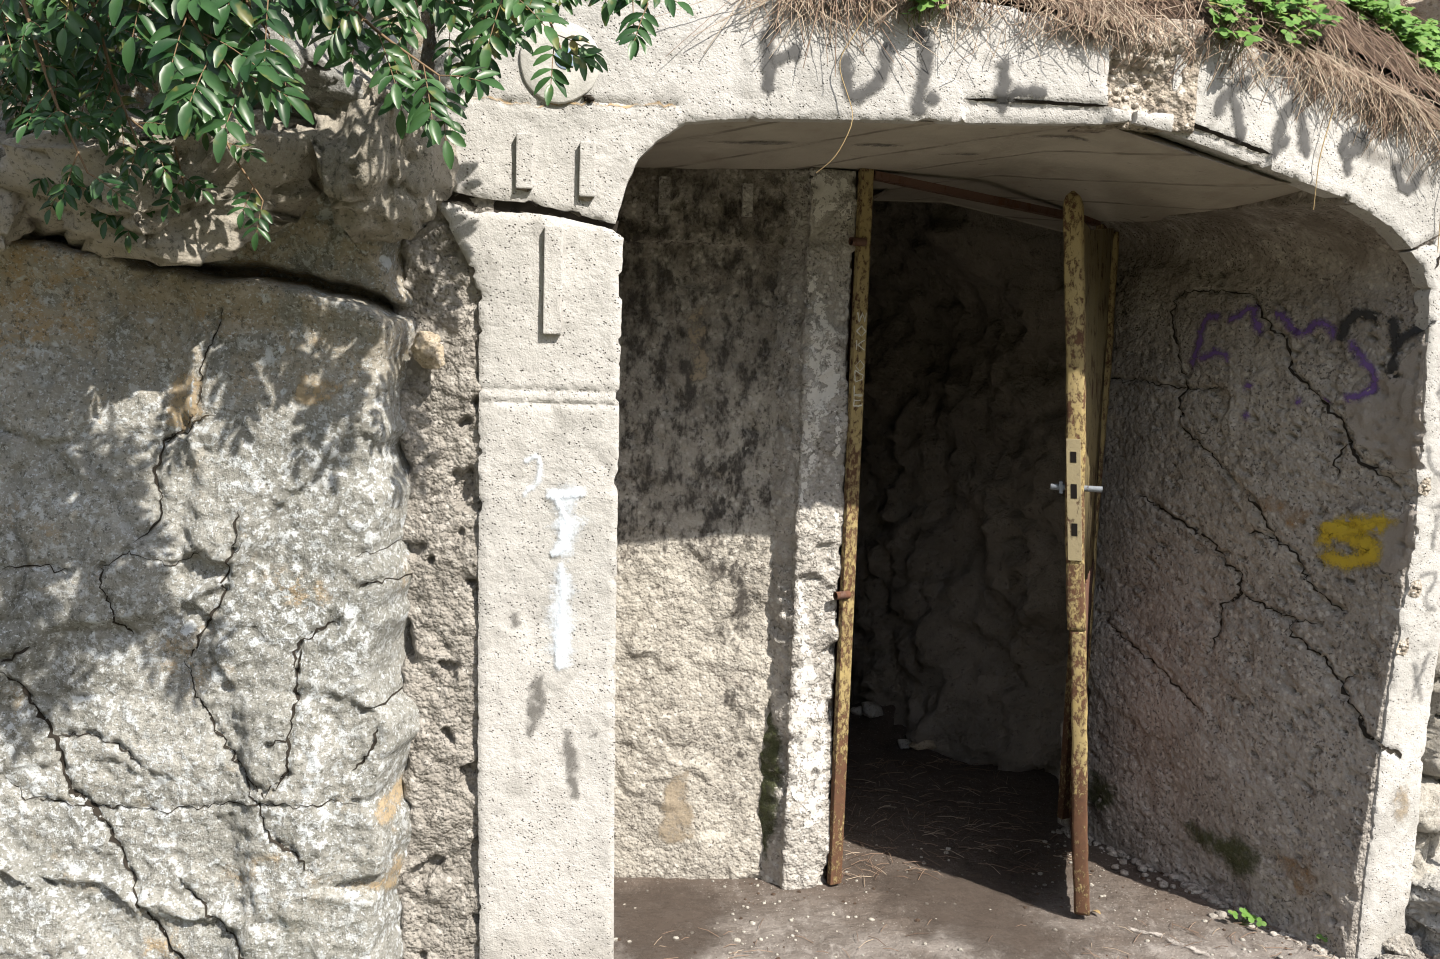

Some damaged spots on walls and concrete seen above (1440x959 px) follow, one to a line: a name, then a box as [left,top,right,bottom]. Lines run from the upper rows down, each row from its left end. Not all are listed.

leakage [608,169,785,653]
crack [1111,289,1393,483]
crack [0,310,403,959]
crack [354,539,413,588]
leakage [725,691,745,726]
crack [1108,617,1201,711]
crack [1142,492,1402,759]